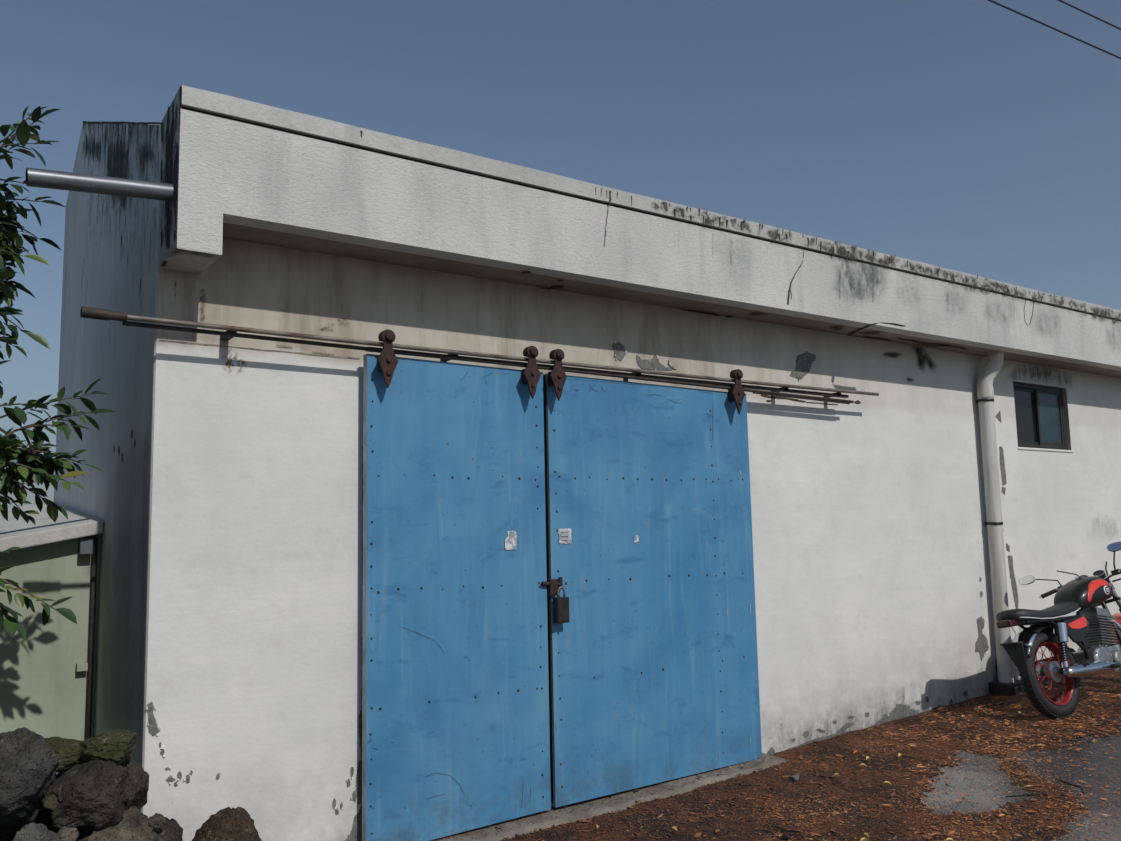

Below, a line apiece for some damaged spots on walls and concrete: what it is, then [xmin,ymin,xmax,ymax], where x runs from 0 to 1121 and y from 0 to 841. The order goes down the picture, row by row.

leakage [83,87,212,266]
crack [787,249,804,305]
leakage [655,202,1121,322]
peeling [612,342,676,371]
spalling [790,351,816,382]
leakage [916,344,945,368]
peeling [975,616,989,661]
peeling [146,702,193,787]
peeling [333,709,362,841]